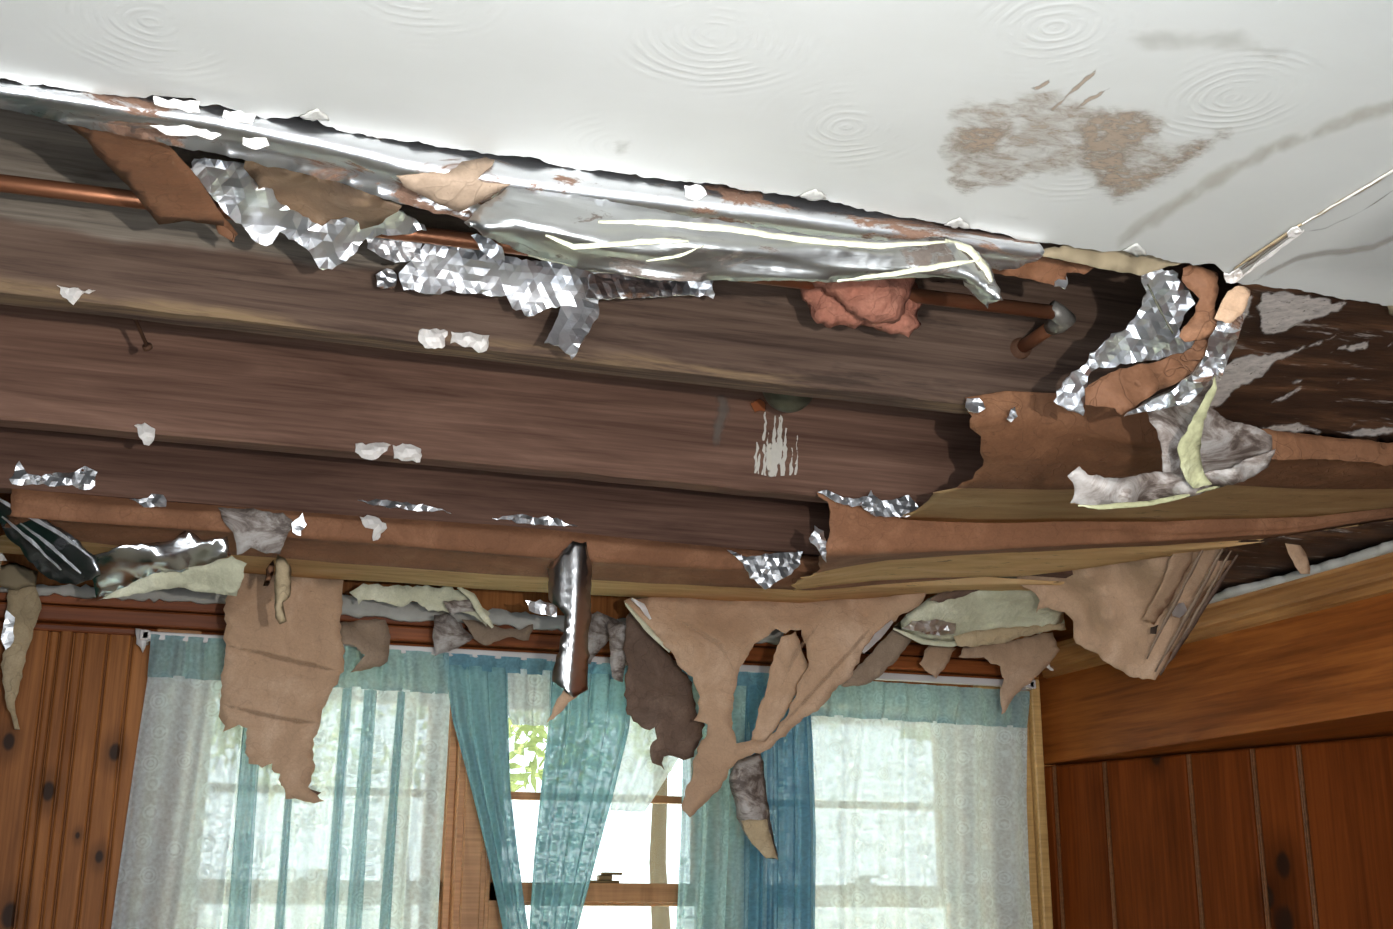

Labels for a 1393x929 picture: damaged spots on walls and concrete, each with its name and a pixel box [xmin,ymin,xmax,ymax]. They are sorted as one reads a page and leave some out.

flaking render [300,109,329,121]
flaking render [150,96,269,150]
leakage [951,71,1201,194]
flaking render [684,184,707,201]
flaking render [800,189,826,201]
flaking render [944,217,970,229]
flaking render [1122,243,1147,257]
flaking render [1224,268,1243,283]